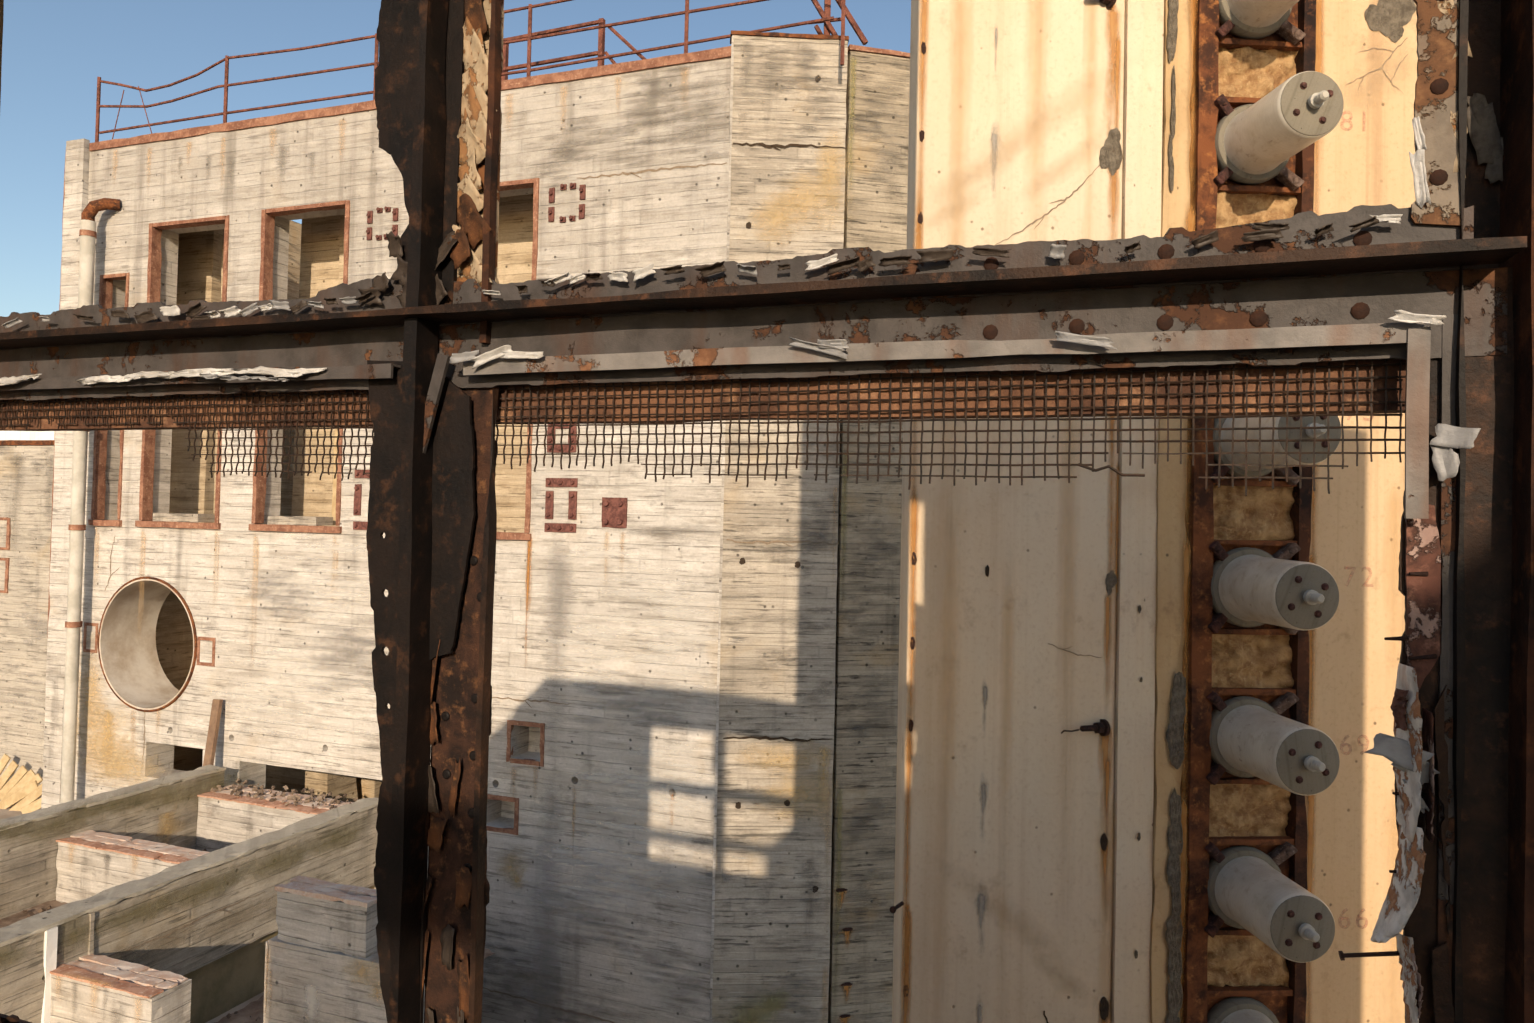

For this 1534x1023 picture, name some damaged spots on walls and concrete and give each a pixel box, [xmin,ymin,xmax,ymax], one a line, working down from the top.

corrosion [919,0,927,142]
spalling [1365,0,1416,43]
crack [996,165,1100,245]
crack [723,735,831,743]
corrosion [903,495,917,1023]
peeling [1363,663,1440,1023]